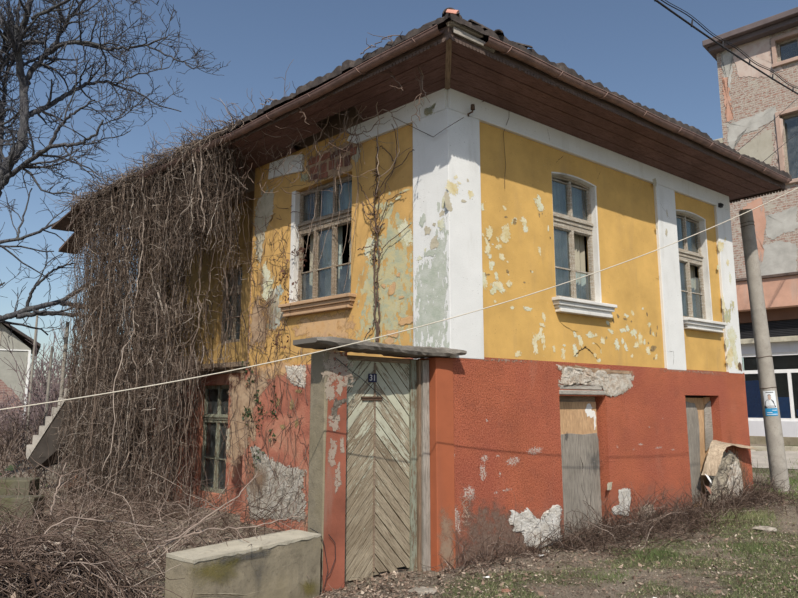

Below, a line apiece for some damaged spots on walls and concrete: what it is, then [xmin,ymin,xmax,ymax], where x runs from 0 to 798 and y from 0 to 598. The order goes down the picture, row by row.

peeling [249,261,284,349]
peeling [293,175,474,348]
peeling [482,206,528,303]
spalling [532,308,658,397]
peeling [721,292,742,371]
spalling [225,361,307,522]
peeling [321,347,356,494]
spalling [509,504,562,548]
spalling [607,482,658,518]